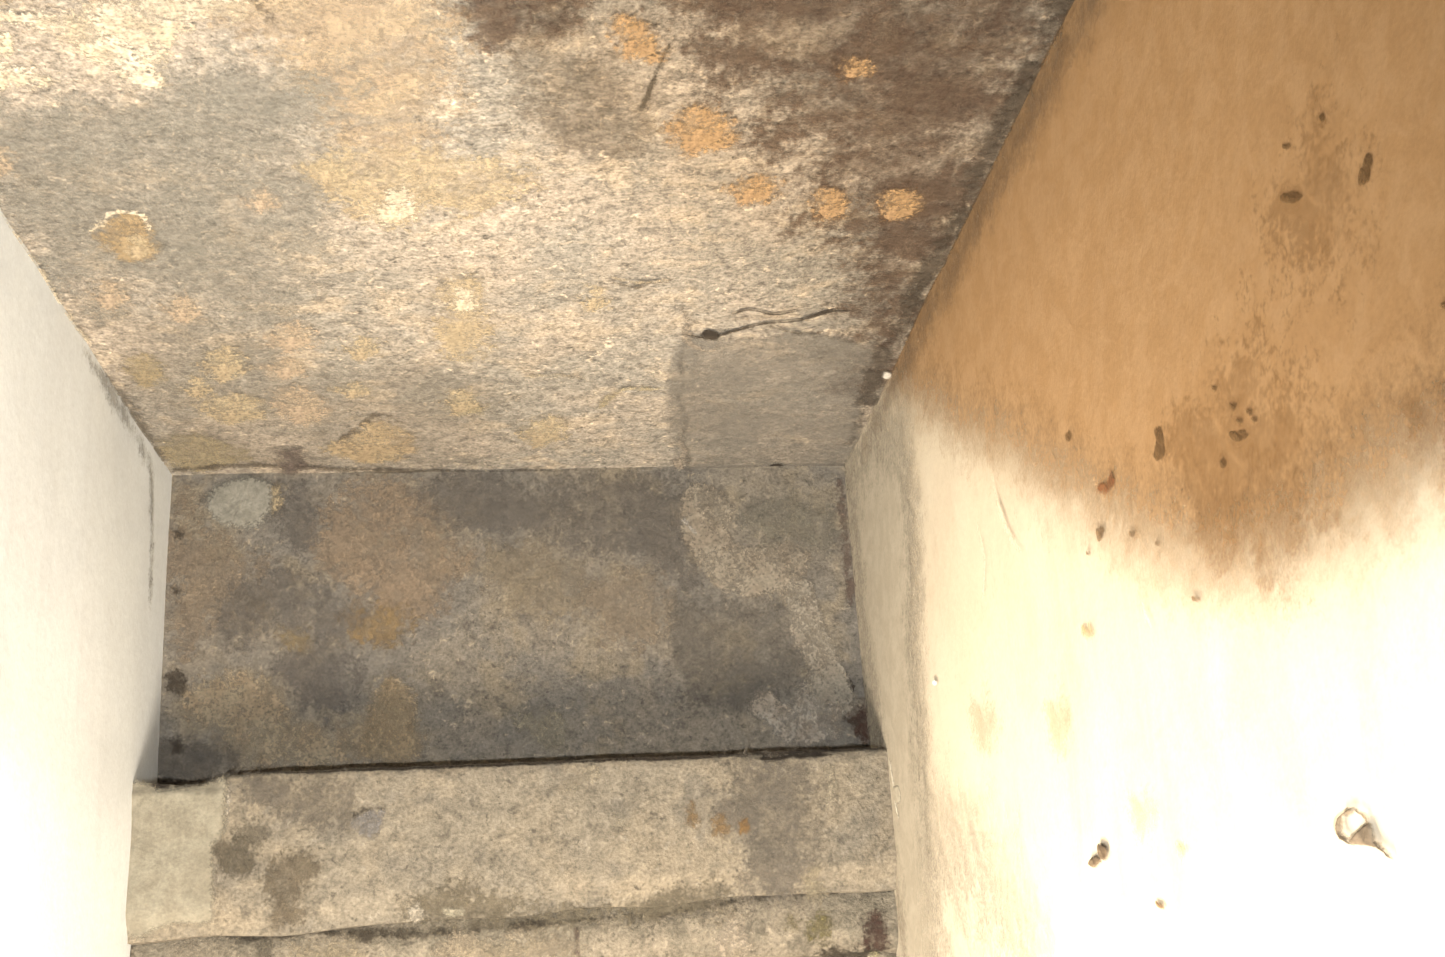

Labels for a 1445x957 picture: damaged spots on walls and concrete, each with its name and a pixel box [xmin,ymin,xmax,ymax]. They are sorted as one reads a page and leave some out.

damp [454,0,593,56]
crack [612,277,851,469]
crack [145,747,883,789]